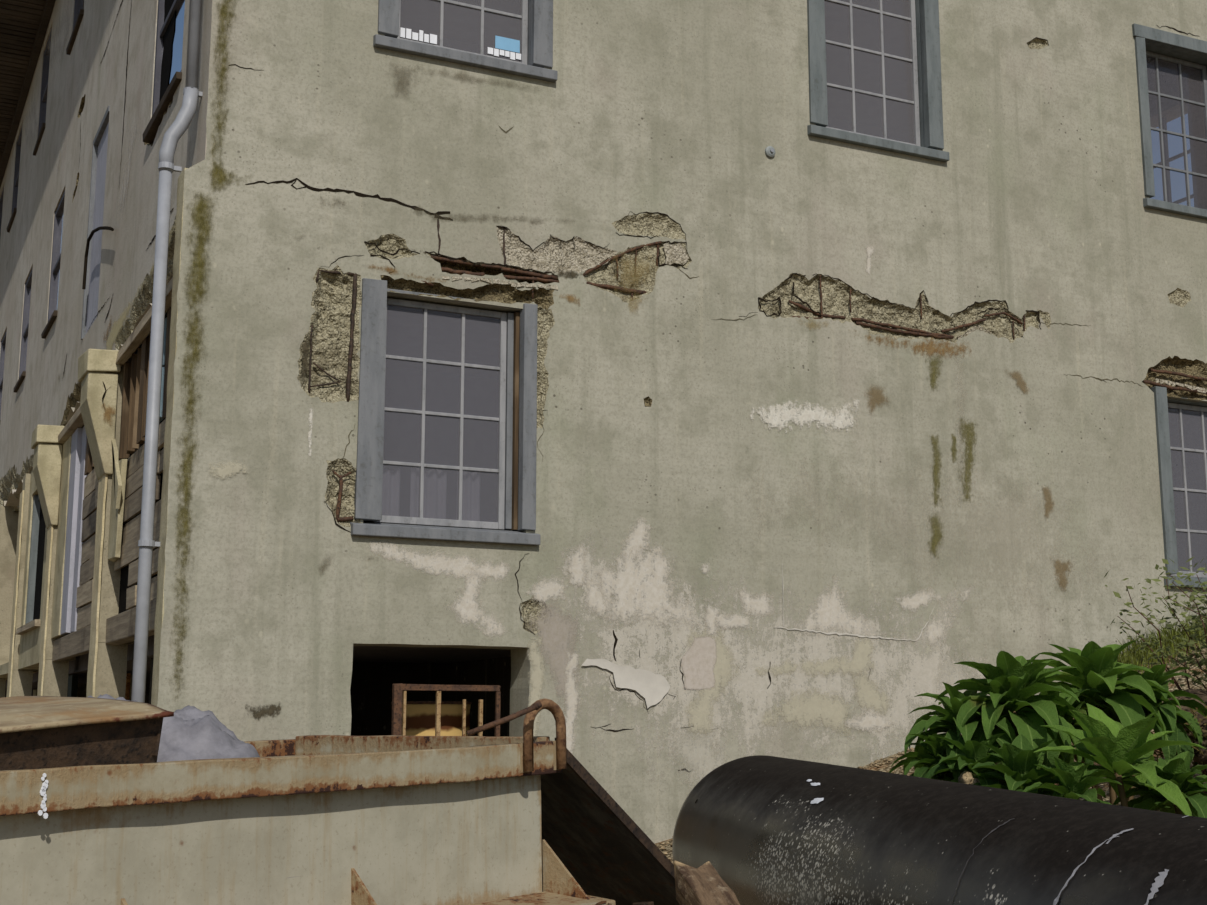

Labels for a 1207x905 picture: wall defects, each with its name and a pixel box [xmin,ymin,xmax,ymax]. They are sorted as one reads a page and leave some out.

crack [245,178,450,215]
spalling [106,217,176,350]
spalling [297,212,692,462]
water stain [750,388,885,433]
spalling [739,273,1051,343]
spalling [1142,356,1207,400]
spalling [0,455,34,513]
spalling [325,426,361,532]
water stain [930,419,975,554]
spalling [519,595,552,736]
peeling [564,636,717,753]
peeling [931,657,968,716]